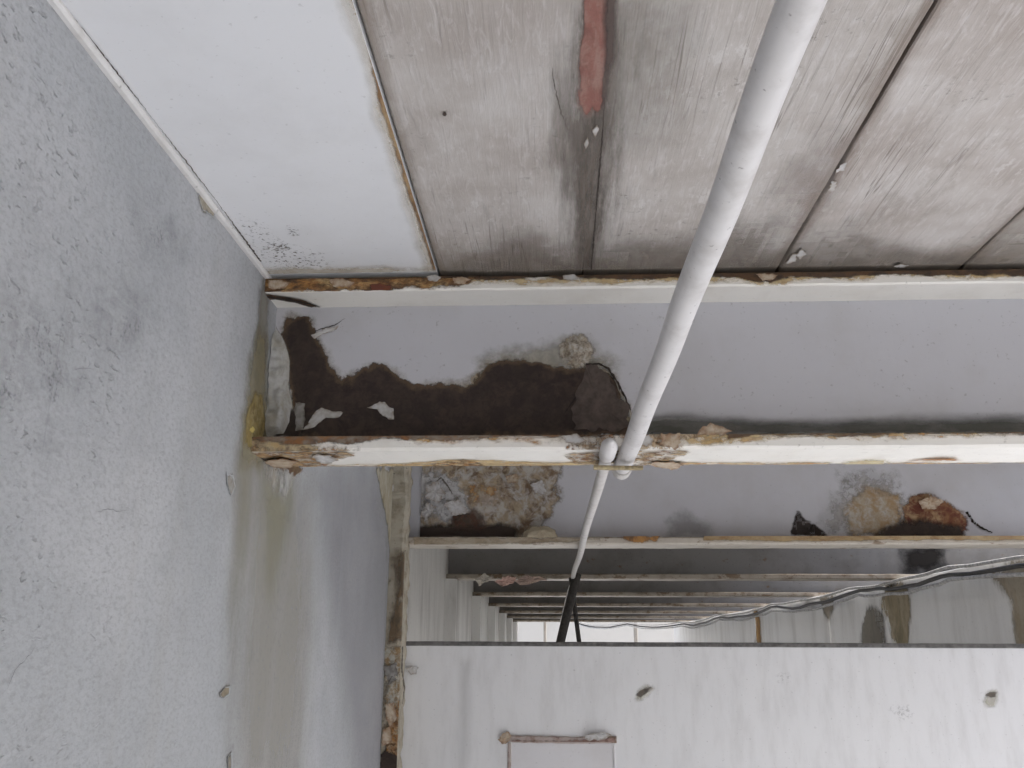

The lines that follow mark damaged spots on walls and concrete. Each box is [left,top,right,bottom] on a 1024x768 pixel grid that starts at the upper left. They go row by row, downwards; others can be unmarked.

mould [76,20,319,268]
corrosion [265,59,680,307]
leakage [552,0,621,270]
corrosion [710,269,1024,285]
peeling [281,316,632,436]
peeling [697,423,732,436]
spalling [420,464,563,537]
spalling [826,472,992,536]
flaking render [377,466,418,768]